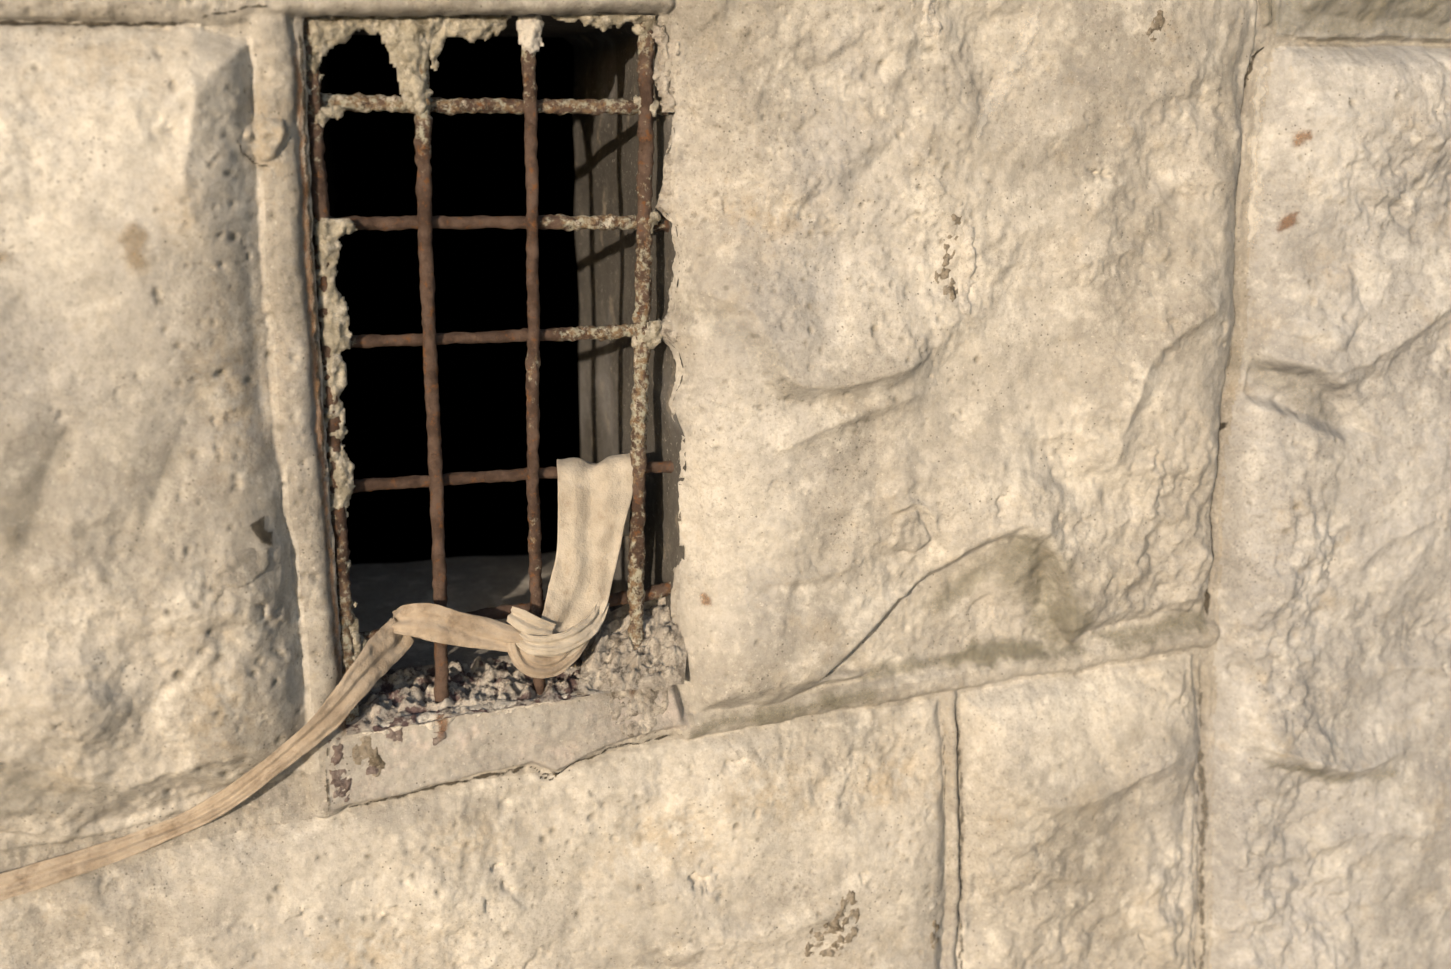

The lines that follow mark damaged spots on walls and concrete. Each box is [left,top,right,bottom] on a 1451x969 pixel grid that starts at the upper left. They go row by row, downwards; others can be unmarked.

rust [294,57,340,661]